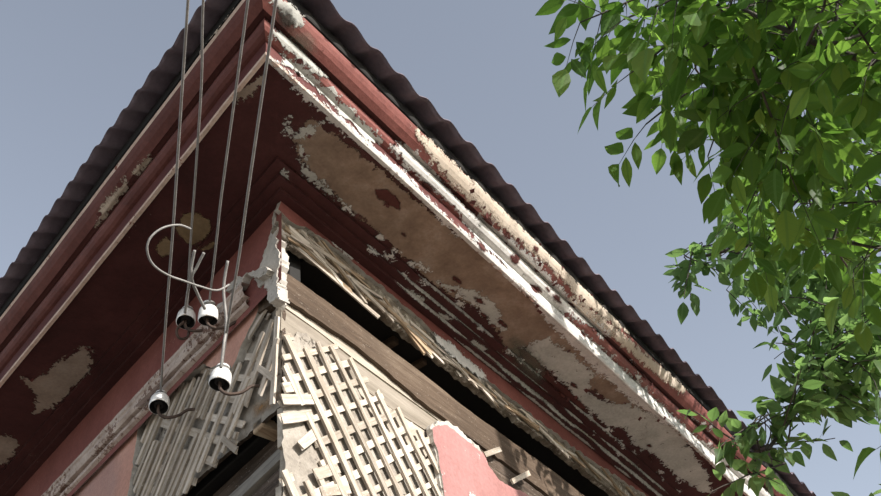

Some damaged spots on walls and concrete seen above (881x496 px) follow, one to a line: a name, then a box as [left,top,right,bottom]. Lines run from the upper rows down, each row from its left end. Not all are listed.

peeling [94,154,153,228]
peeling [156,212,215,258]
peeling [267,0,771,496]
peeling [19,346,94,415]
flaking render [132,308,442,496]
peeling [0,433,20,465]